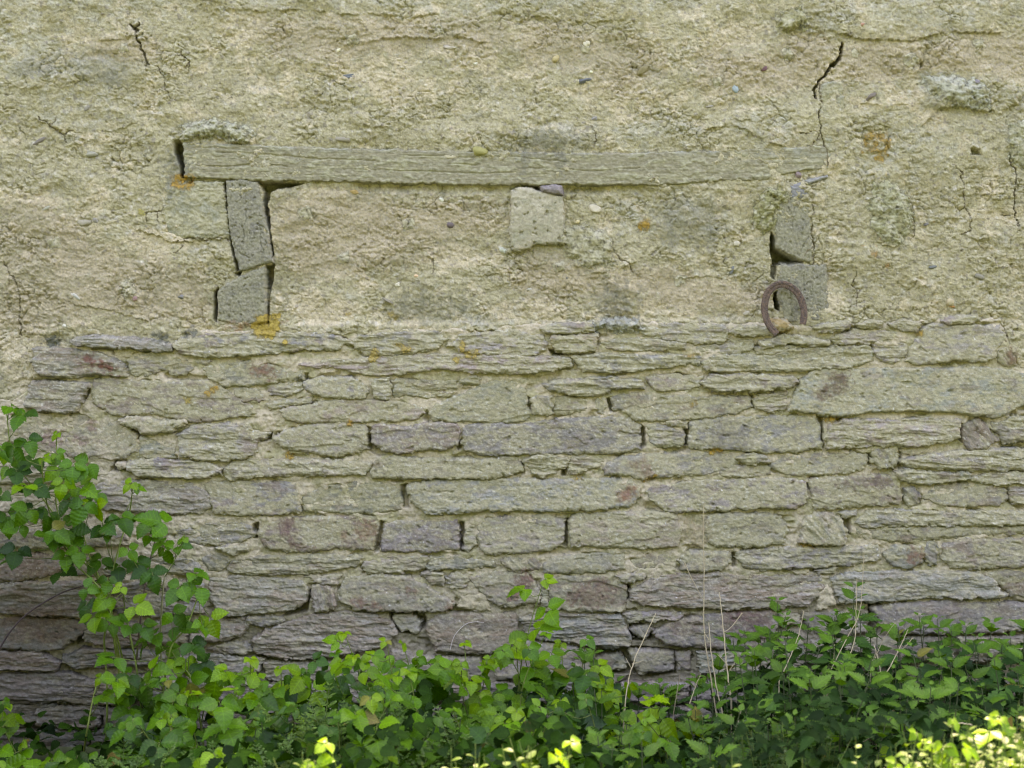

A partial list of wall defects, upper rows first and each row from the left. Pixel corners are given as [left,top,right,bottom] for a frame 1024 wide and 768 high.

crack [131,21,190,101]
crack [800,45,842,166]